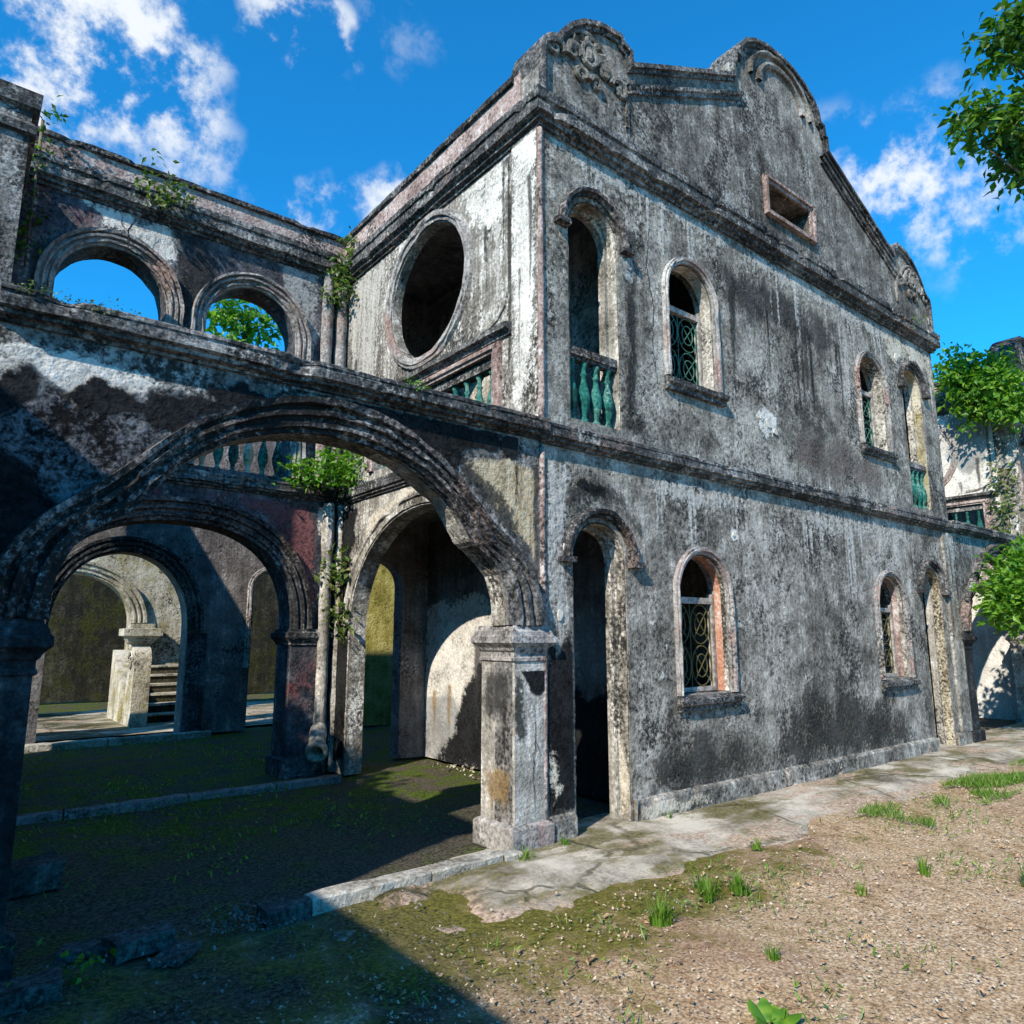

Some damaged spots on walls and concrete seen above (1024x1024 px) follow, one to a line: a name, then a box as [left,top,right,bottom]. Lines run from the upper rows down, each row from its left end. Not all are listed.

leakage [501,155,512,321]
peeling [756,404,778,439]
leakage [0,359,539,579]
leakage [564,469,643,538]
leakage [647,478,739,547]
leakage [651,677,917,795]
rust [486,768,509,812]